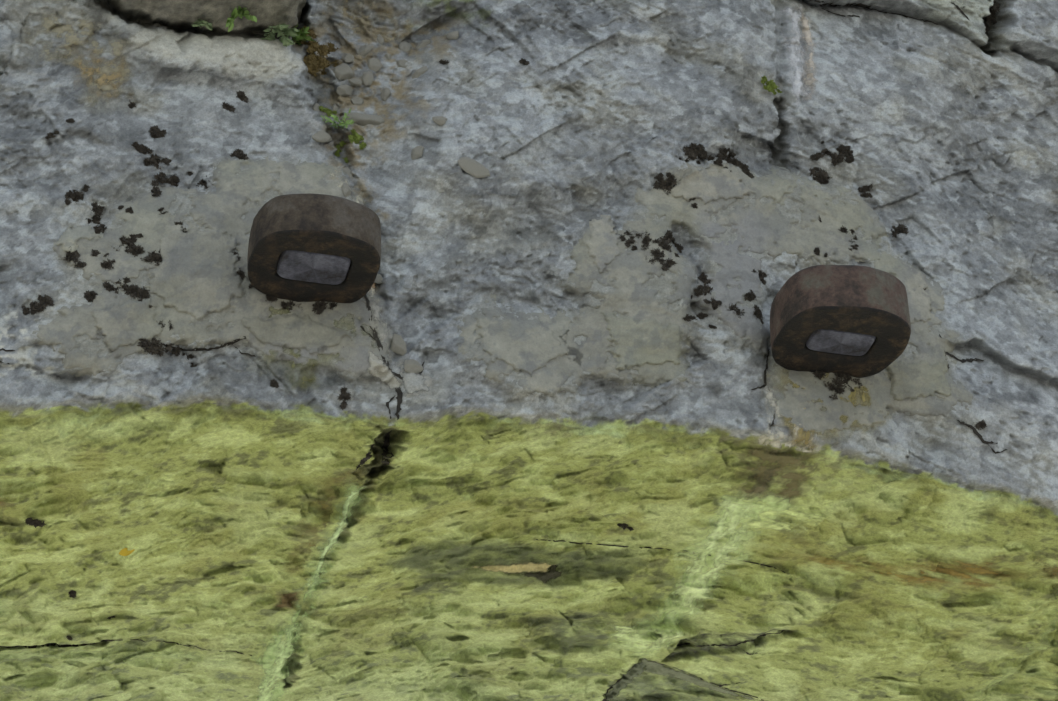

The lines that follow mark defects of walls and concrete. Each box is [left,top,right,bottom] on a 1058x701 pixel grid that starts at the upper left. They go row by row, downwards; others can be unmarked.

crack [352,295,424,470]
leakage [0,649,82,660]
crack [0,639,252,656]
leakage [257,486,363,701]
crack [602,630,785,701]
leakage [609,392,819,656]